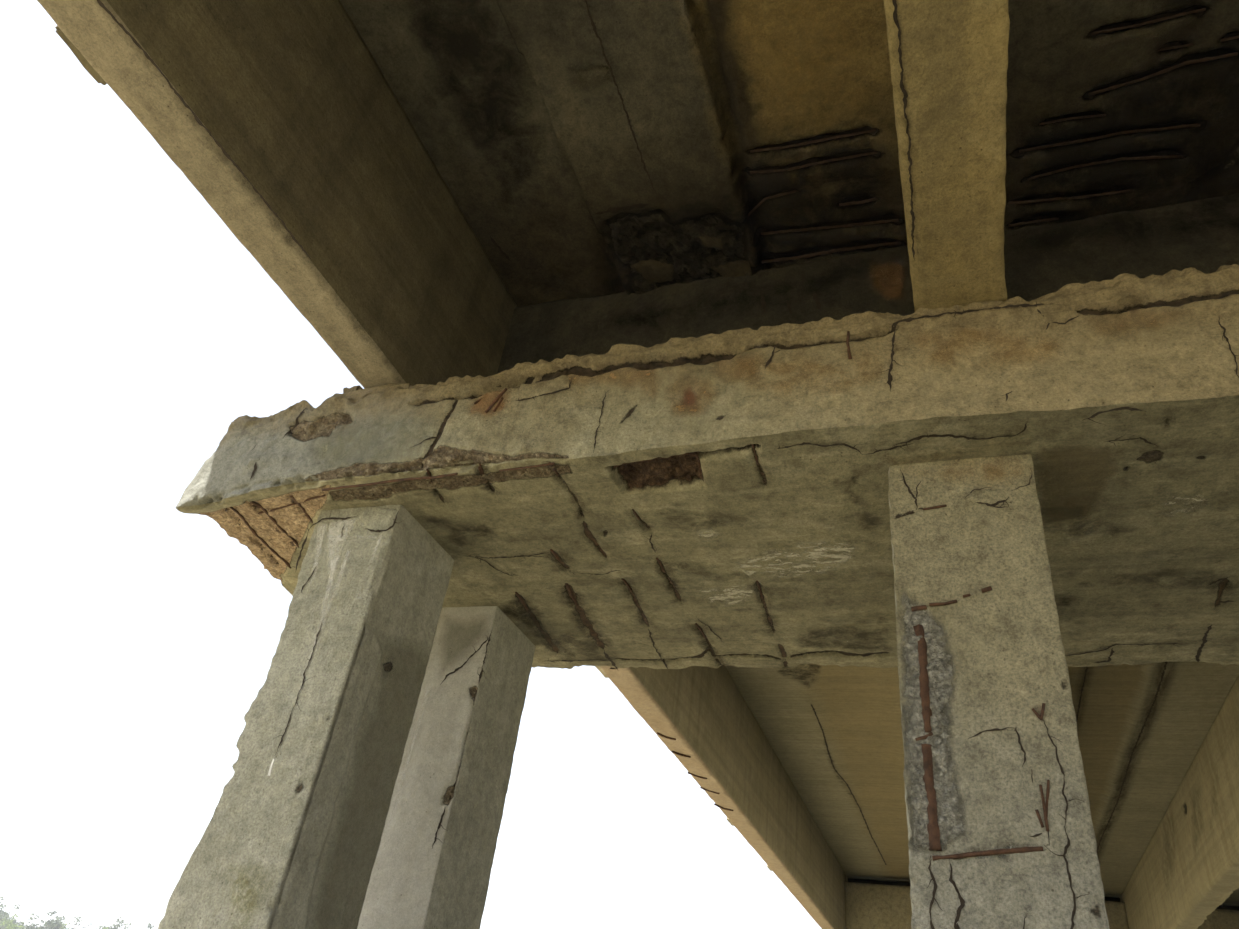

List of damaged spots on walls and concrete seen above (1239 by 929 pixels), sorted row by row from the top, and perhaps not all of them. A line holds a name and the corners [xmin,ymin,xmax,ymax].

crack [892,0,915,260]
spalling [285,409,352,442]
crack [296,506,404,592]
spalling [199,445,608,584]
spalling [612,444,767,490]
crack [273,620,323,753]
crack [440,637,489,685]
crack [542,647,889,664]
crack [811,704,886,865]
spalling [903,586,1050,861]
crack [968,641,1201,929]
crack [927,856,965,929]